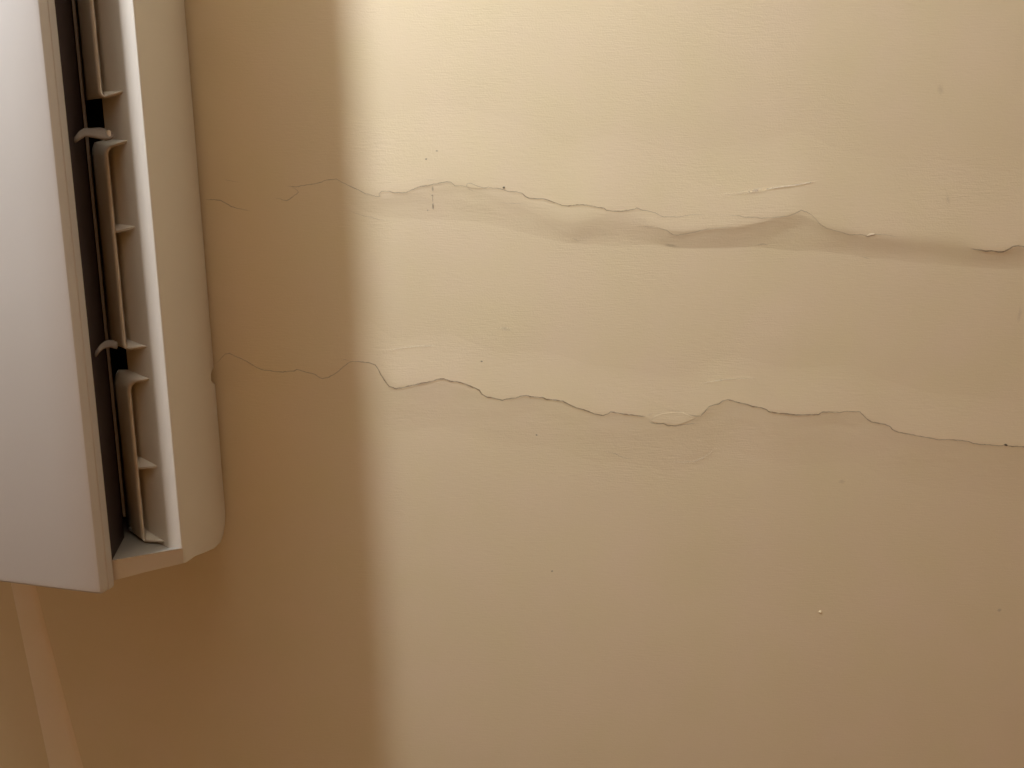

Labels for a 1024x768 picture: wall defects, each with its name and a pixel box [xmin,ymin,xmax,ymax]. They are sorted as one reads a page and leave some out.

crack [379,371,695,425]
crack [730,400,823,415]